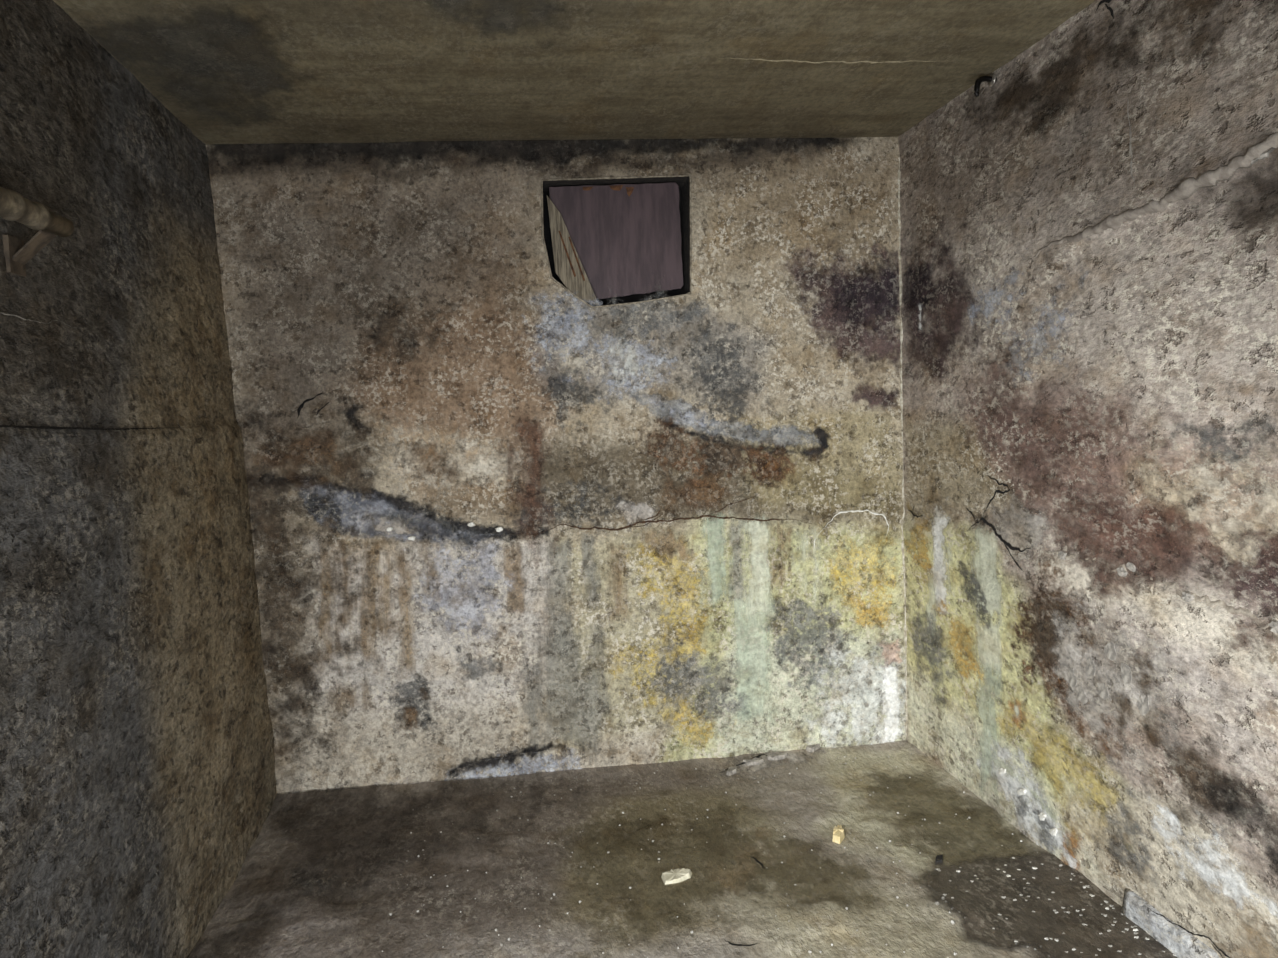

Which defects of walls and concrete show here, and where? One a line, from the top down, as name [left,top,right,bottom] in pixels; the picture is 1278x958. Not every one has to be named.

crack [0,423,188,431]
water stain [967,286,1278,613]
water stain [511,470,1278,930]
water stain [274,784,498,895]
water stain [865,774,1178,958]